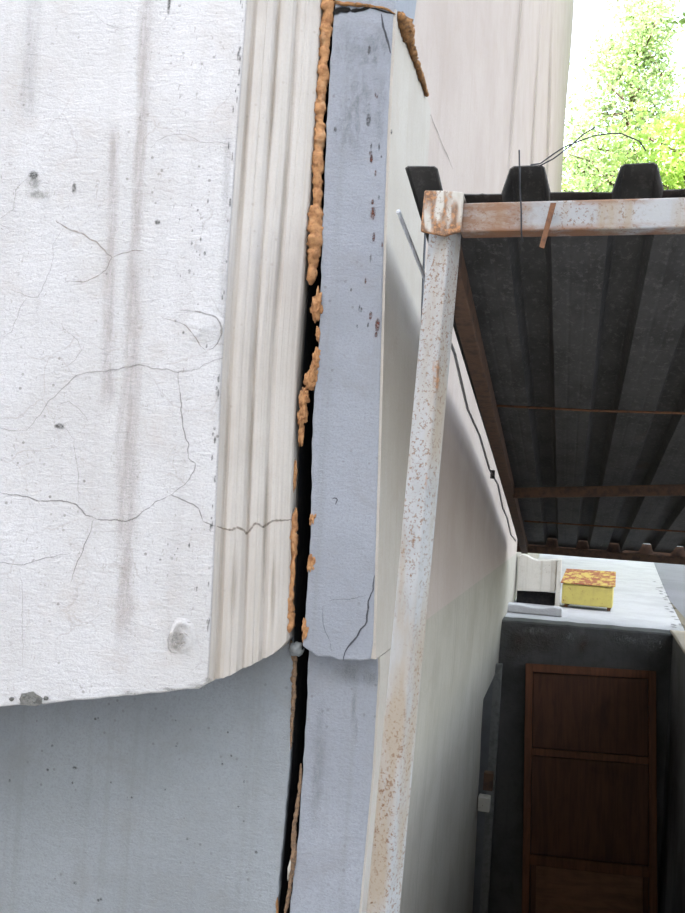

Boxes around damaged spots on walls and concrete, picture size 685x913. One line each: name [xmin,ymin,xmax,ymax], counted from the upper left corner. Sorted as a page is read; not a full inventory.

crack [56,221,143,282]
crack [2,382,291,658]
crack [275,576,375,913]